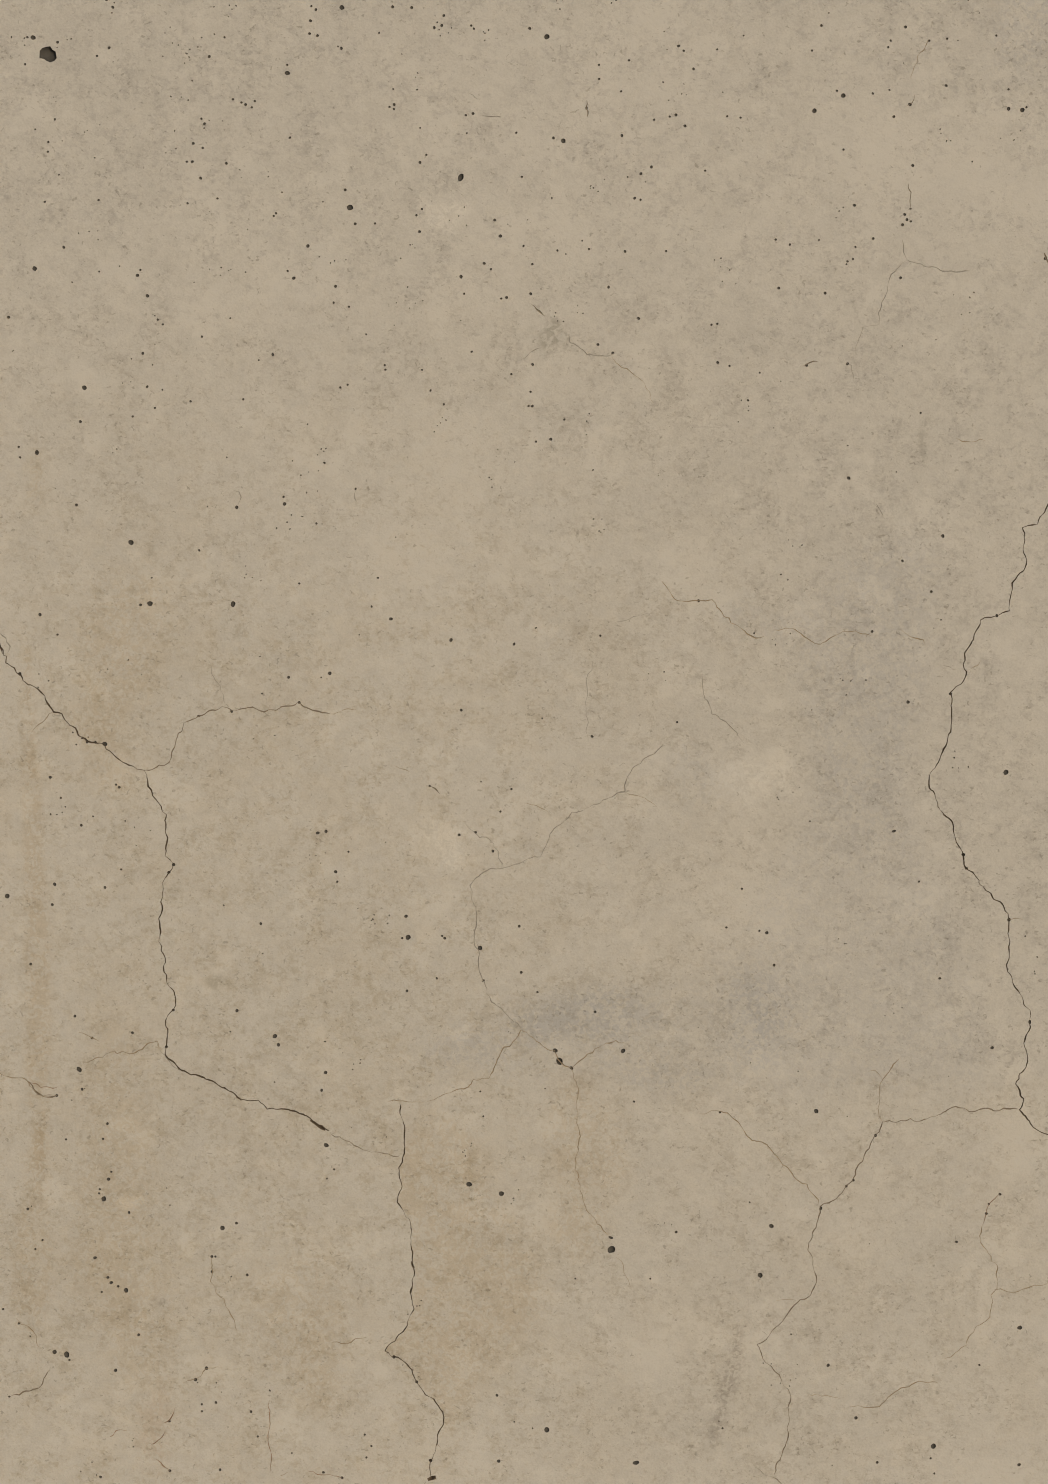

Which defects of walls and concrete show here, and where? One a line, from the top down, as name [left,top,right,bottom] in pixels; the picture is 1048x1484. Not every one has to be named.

crack [521,304,652,401]
crack [804,184,967,379]
crack [0,634,662,1483]
crack [618,504,1048,1483]